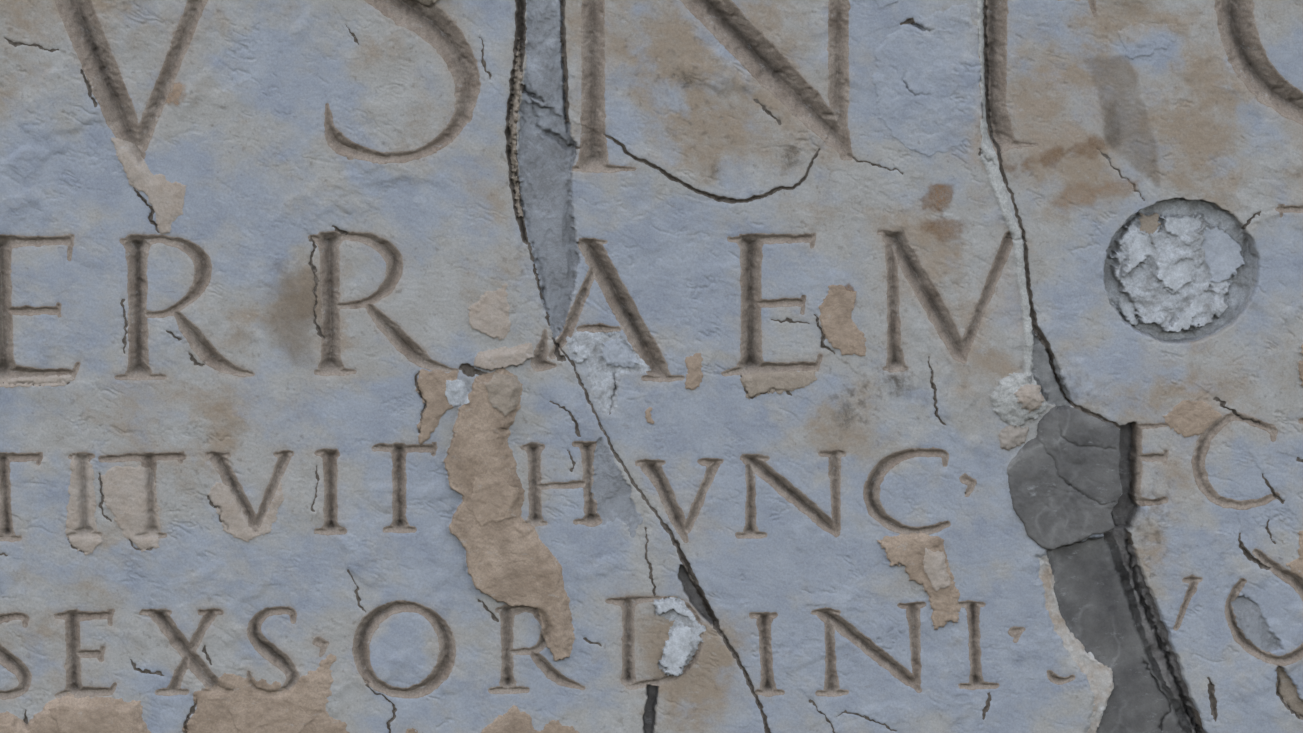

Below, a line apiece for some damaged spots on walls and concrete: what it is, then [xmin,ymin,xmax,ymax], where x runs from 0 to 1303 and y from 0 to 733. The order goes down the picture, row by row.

crack [900,18,925,29]
flaking render [517,0,651,414]
flaking render [1103,198,1258,342]
crack [478,0,820,733]
crack [771,314,835,354]
crack [928,356,946,425]
crack [978,0,1218,733]
peeling [416,343,575,661]
peeling [877,531,961,630]
flaking render [653,597,706,677]
peeling [0,692,151,733]
crack [809,699,897,733]